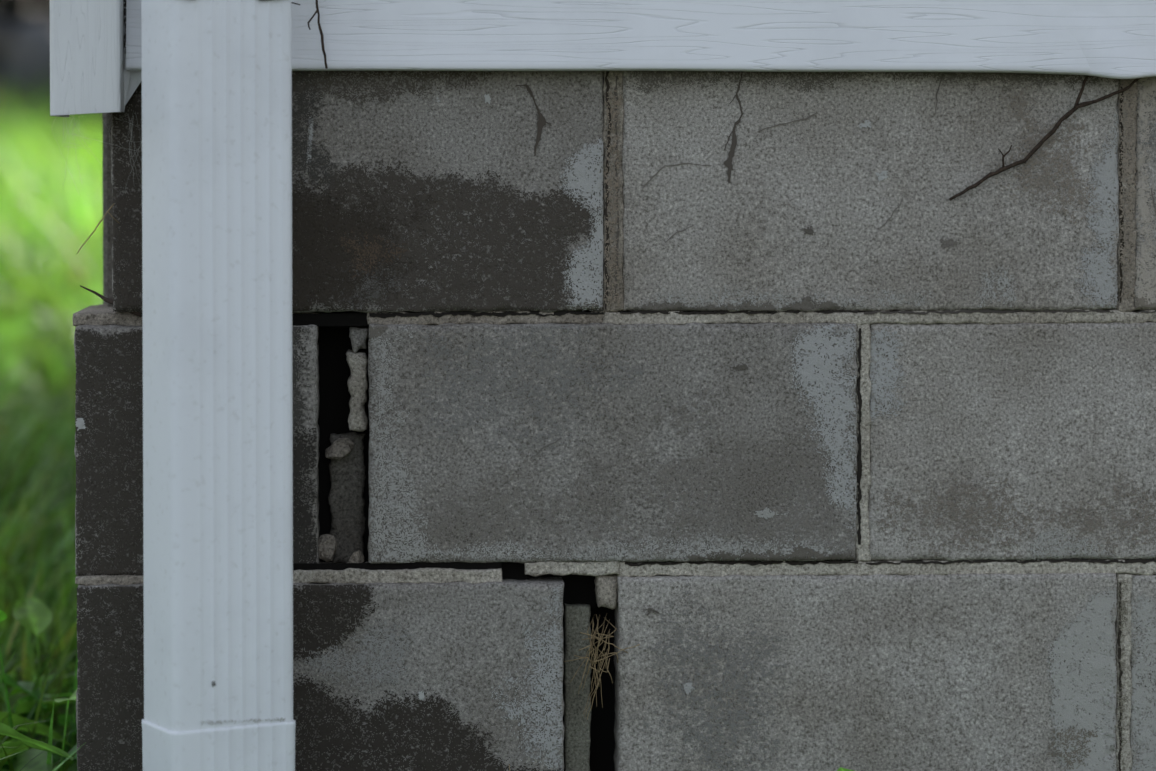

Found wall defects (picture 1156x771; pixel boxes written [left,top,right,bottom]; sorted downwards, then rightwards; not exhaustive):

leakage [292,71,603,311]
leakage [624,71,1120,310]
leakage [1135,76,1156,309]
leakage [292,326,317,563]
crack [292,71,1156,771]
leakage [369,324,1156,563]
leakage [293,584,563,771]
leakage [622,583,791,771]
leakage [1046,587,1117,771]
leakage [1130,592,1156,771]